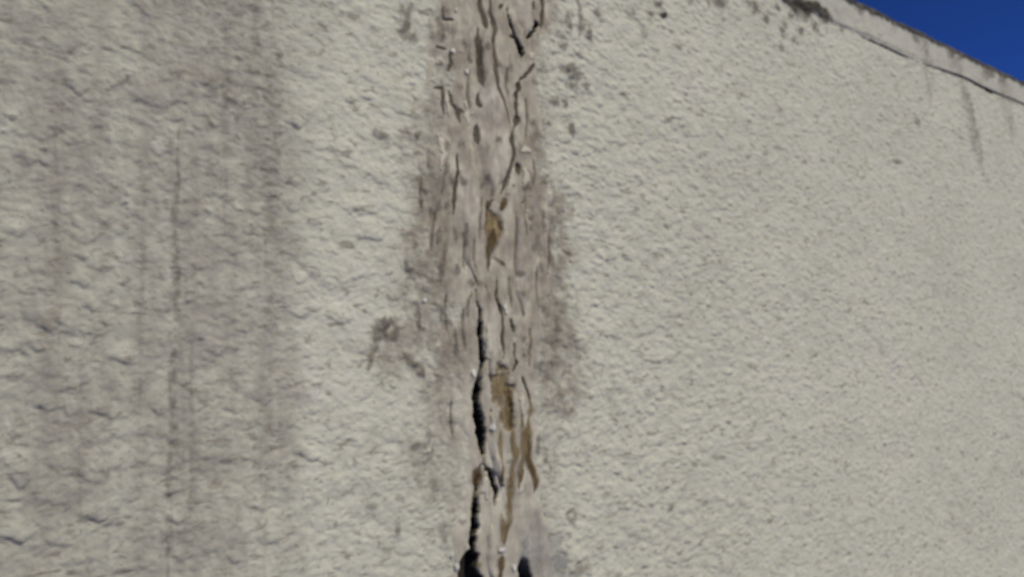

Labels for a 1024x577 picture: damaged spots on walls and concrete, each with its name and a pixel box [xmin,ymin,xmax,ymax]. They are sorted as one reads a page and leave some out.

crack [419,0,549,551]